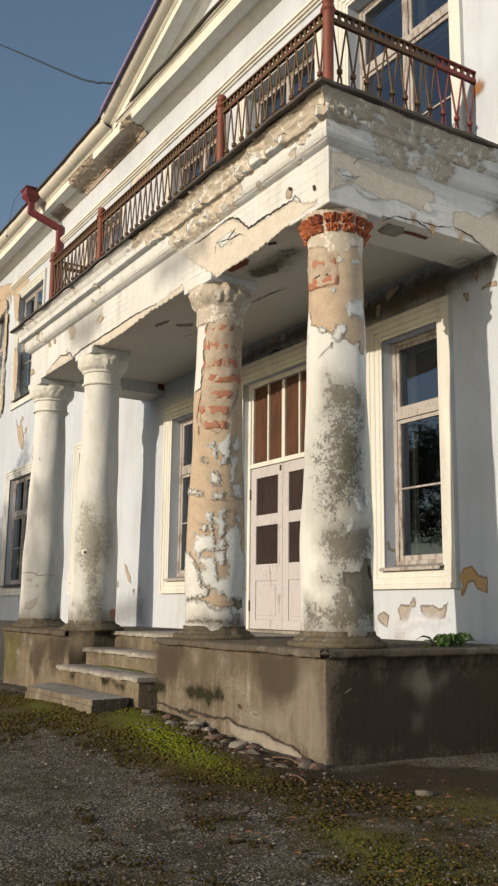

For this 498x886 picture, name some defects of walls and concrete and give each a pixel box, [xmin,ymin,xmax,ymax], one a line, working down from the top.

peeling [329,150,435,213]
crack [197,195,300,254]
peeling [452,209,498,256]
peeling [182,198,428,355]
peeling [16,416,27,449]
peeling [184,316,245,609]
damp [326,426,358,505]
flaking render [342,557,448,627]
peeling [460,566,488,596]
crack [146,687,320,764]